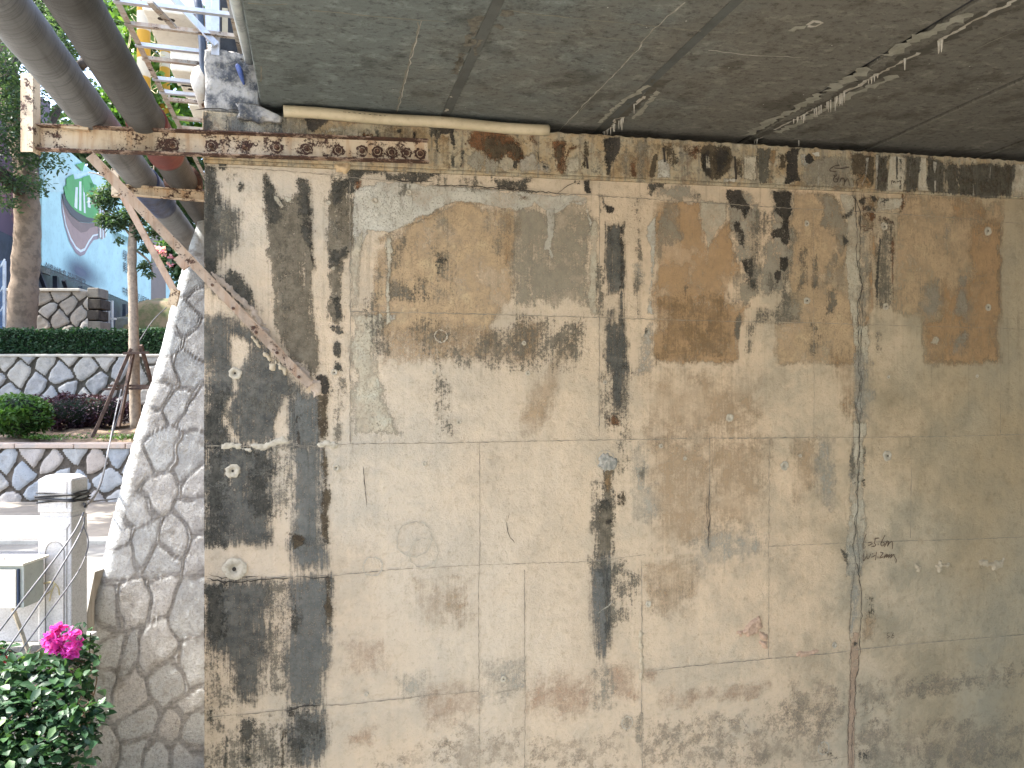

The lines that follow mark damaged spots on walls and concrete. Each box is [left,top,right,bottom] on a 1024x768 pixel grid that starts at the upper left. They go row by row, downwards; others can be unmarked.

rust [332,144,427,160]
peeling [349,181,592,436]
damp [203,79,758,768]
rust [459,131,600,175]
crack [847,173,864,759]
damp [726,0,1024,768]